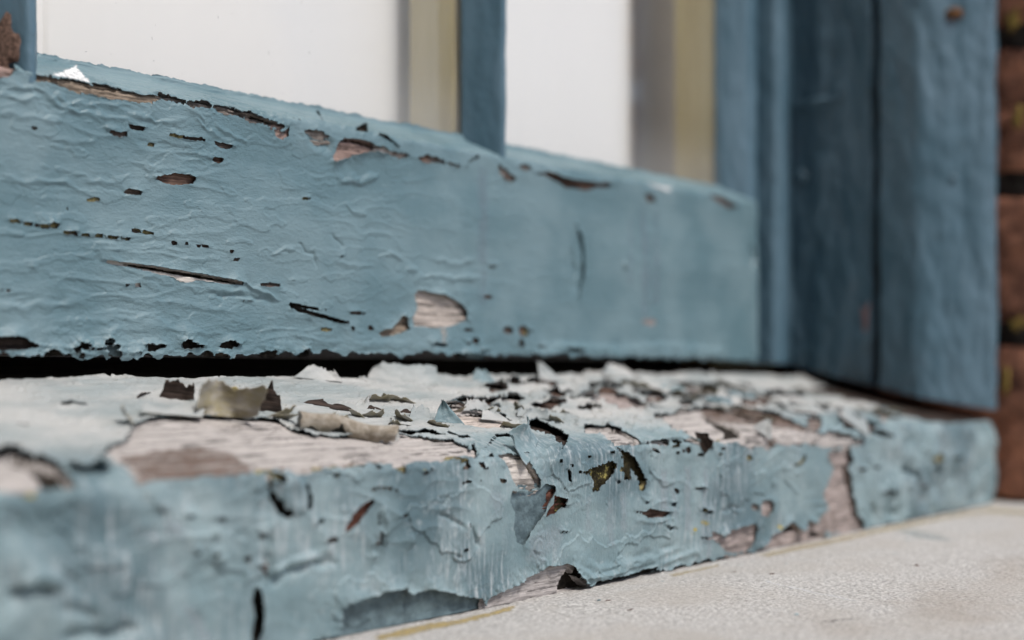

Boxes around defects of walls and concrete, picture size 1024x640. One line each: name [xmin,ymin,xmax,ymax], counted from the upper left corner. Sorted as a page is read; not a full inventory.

peeling [0,11,621,205]
peeling [641,188,659,209]
peeling [0,210,300,309]
peeling [0,323,246,360]
peeling [48,399,99,409]
peeling [87,280,964,640]